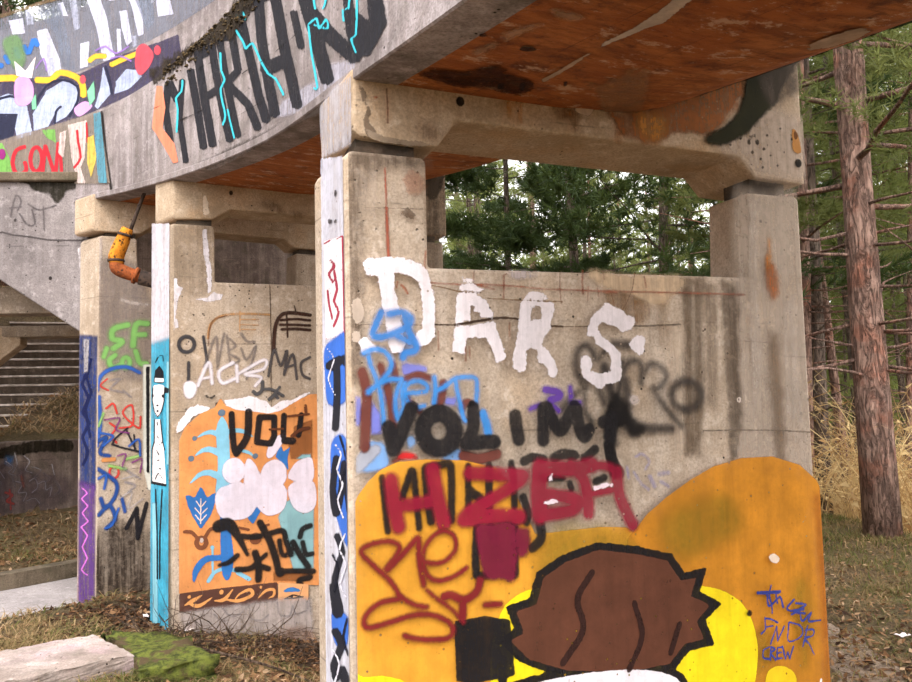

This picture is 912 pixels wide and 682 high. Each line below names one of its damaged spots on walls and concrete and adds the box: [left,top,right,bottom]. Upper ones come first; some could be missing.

rust [608,81,745,143]
rust [766,256,778,298]
damp [590,271,741,457]